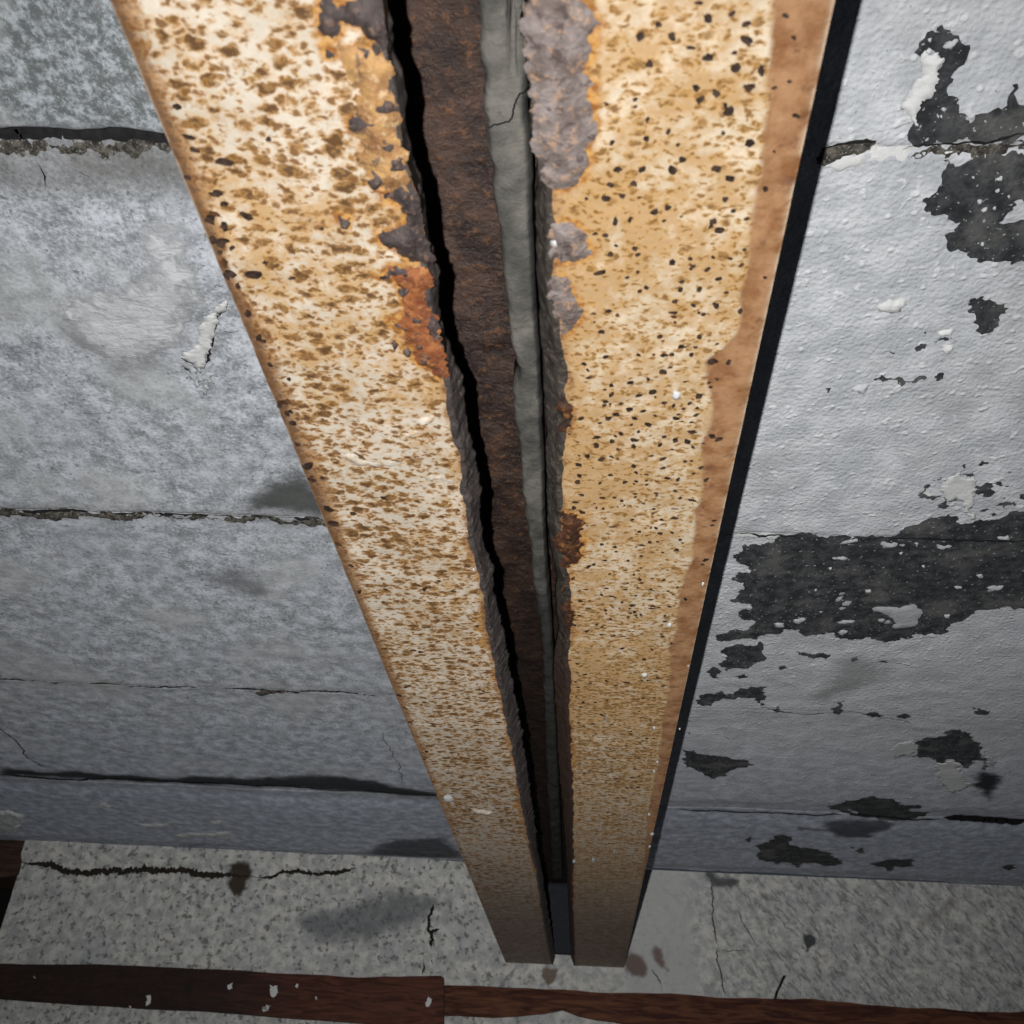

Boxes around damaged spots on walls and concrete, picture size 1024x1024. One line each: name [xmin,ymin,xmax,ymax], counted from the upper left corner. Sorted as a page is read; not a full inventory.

crack [488,84,529,129]
crack [0,127,172,187]
peeling [828,25,1024,265]
peeling [968,296,1009,335]
crack [0,508,326,527]
peeling [696,461,1024,713]
crack [0,728,437,796]
peeling [681,749,754,779]
peeling [890,729,997,796]
crack [21,844,355,880]
corrosion [228,862,251,896]
corrosion [625,948,664,976]